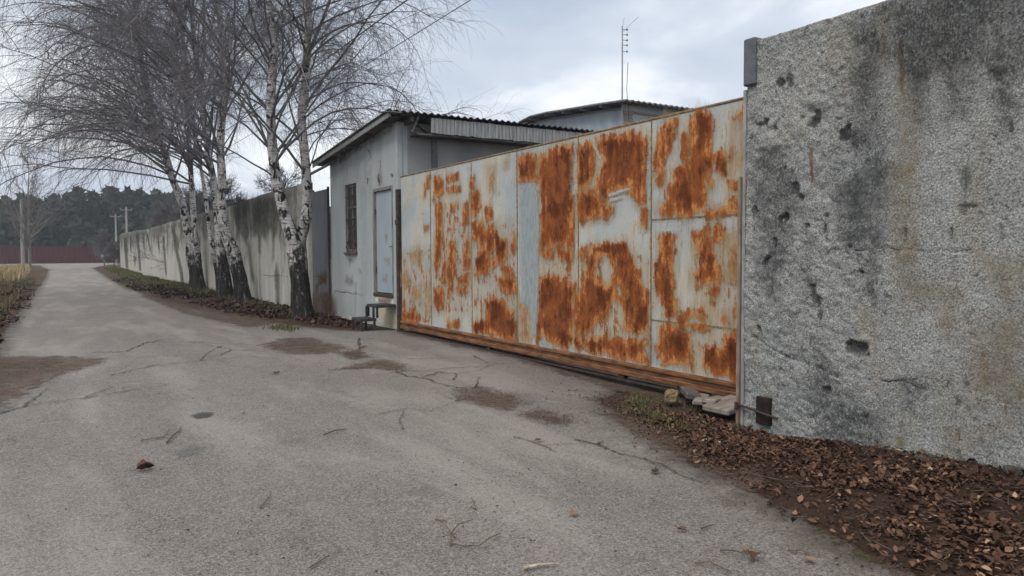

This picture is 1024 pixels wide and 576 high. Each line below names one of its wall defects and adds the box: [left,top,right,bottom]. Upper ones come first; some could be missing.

spalling [777,73,794,87]
damp [852,0,1024,118]
spalling [801,109,821,128]
spalling [839,124,852,141]
damp [124,228,184,282]
damp [232,196,278,277]
corrosion [402,107,738,383]
spalling [846,340,868,356]